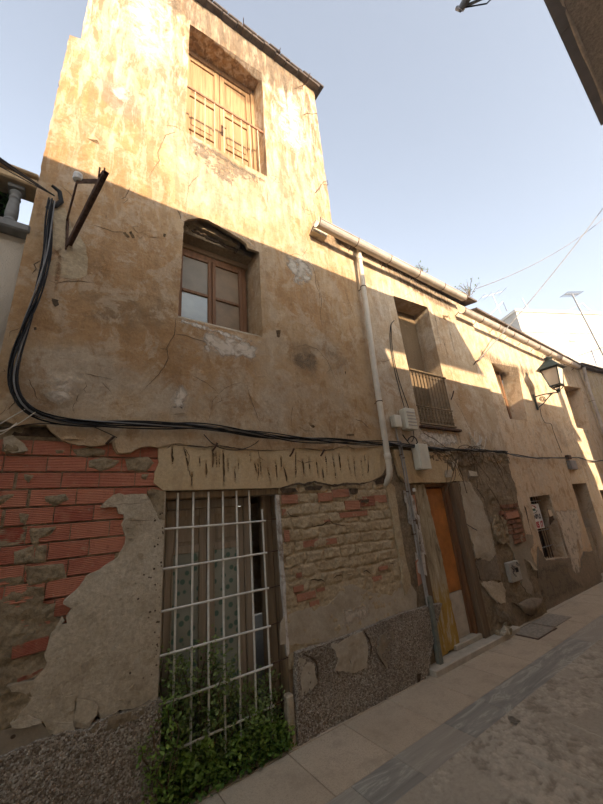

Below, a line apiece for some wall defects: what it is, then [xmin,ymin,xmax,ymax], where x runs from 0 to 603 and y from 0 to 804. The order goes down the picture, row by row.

spalling [199,452,239,481]
peeling [249,455,427,608]
flaking render [498,503,532,544]
flaking render [0,427,165,735]
flaking render [479,580,506,604]